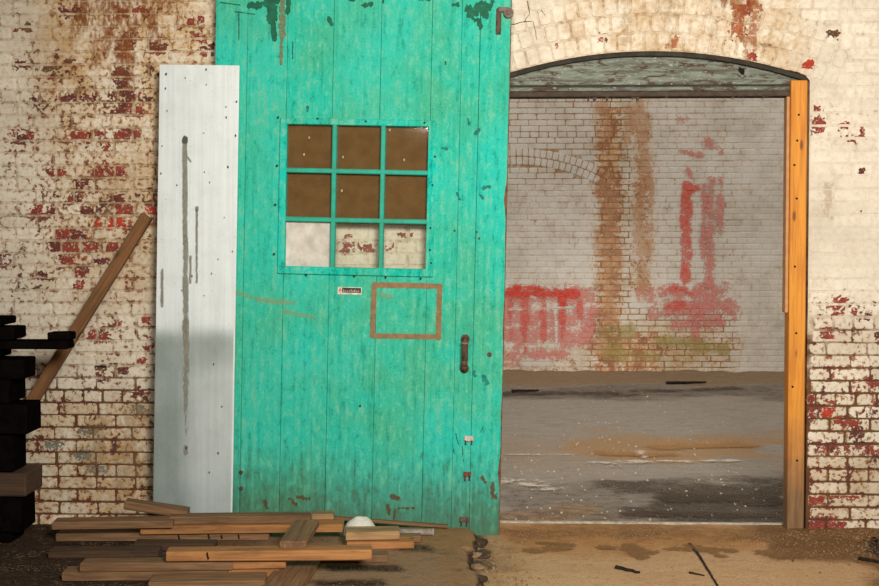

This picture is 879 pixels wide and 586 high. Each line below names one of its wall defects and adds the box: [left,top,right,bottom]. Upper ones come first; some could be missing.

peeling [147,42,169,57]
peeling [186,15,215,58]
rust [721,0,761,59]
peeling [54,33,145,117]
peeling [9,129,36,147]
peeling [68,129,140,152]
peeling [811,105,826,136]
peeling [838,121,865,144]
peeling [36,166,157,293]
peeling [825,295,872,321]
peeling [818,326,835,340]
peeling [94,345,153,384]